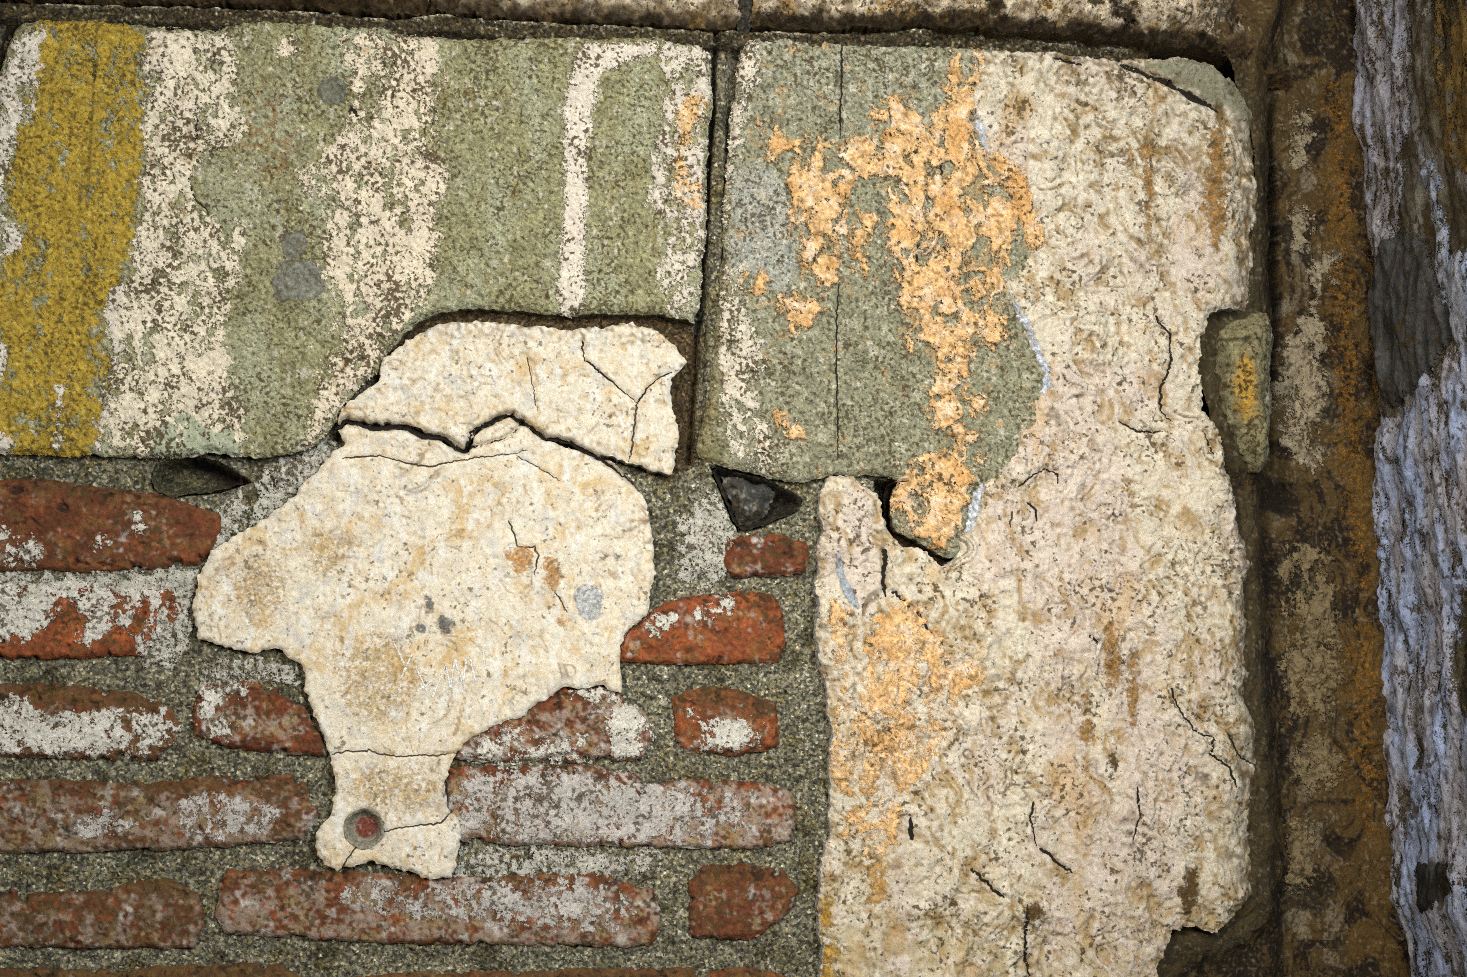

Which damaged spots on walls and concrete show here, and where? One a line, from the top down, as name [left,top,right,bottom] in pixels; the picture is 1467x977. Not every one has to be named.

crack [1053,57,1082,66]
crack [1120,64,1218,113]
crack [335,340,672,484]
crack [1119,315,1214,455]
crack [1009,468,1058,528]
crack [1171,688,1254,787]
crack [907,817,915,840]
crack [1029,801,1073,873]
crack [1133,786,1141,839]
crack [970,868,1031,977]